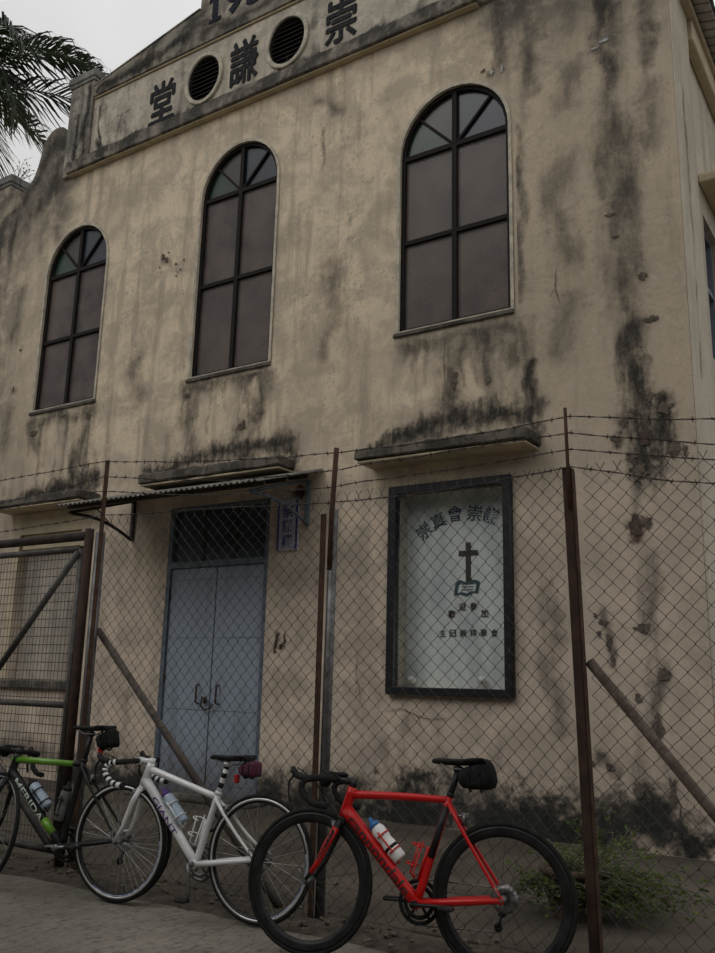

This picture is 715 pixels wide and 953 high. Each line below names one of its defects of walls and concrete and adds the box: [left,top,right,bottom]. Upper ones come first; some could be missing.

damp [617,258,659,340]
damp [19,408,100,497]
damp [144,371,298,474]
damp [369,323,544,447]
damp [256,771,583,844]
damp [594,778,715,859]